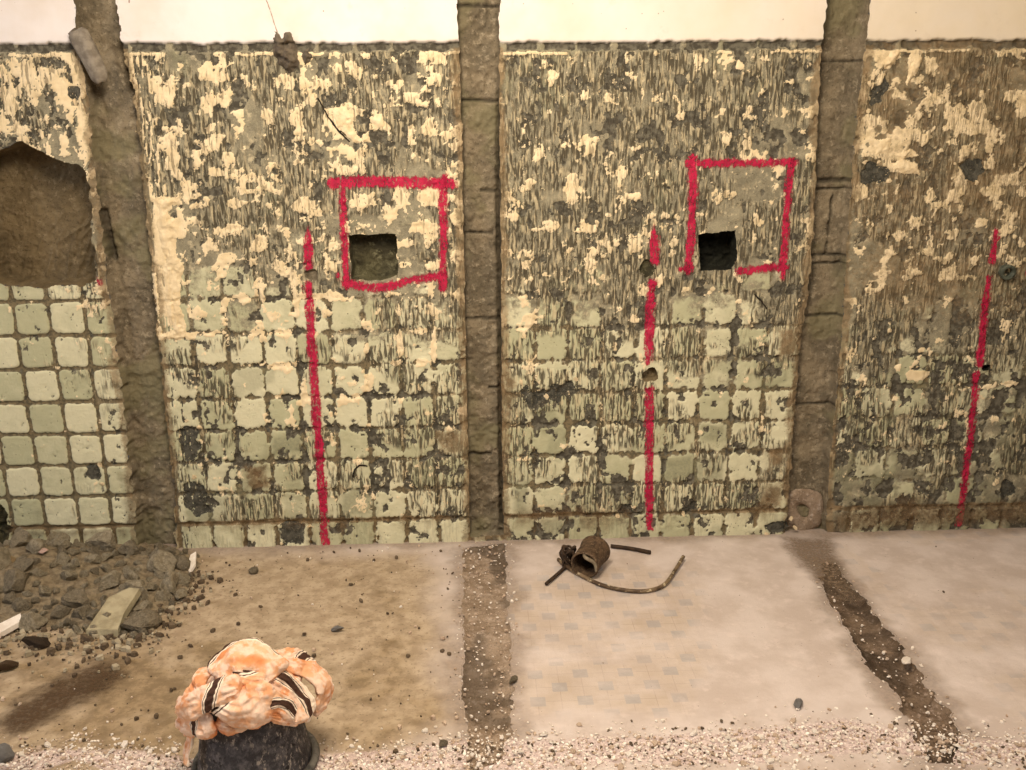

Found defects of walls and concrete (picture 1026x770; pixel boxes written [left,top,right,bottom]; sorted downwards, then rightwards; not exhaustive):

peeling [866,50,922,113]
peeling [331,106,384,143]
peeling [860,138,920,186]
spalling [954,158,984,186]
peeling [151,196,186,341]
spalling [520,377,578,409]
spalling [178,419,202,462]
spalling [183,475,211,517]
spalling [279,520,314,546]
spalling [615,504,636,518]
spalling [764,516,797,535]
spalling [995,478,1016,498]